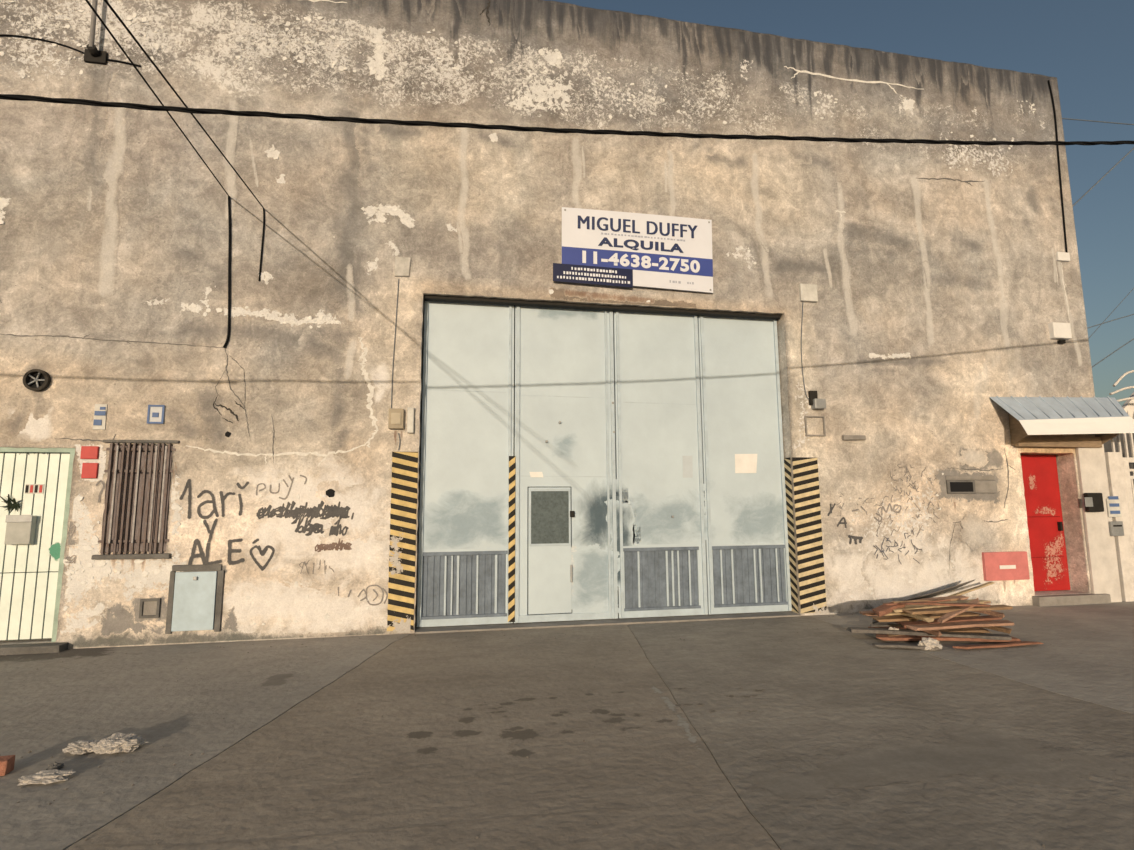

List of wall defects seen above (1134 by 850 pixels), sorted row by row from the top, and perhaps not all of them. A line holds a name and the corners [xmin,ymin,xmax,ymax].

leakage [379,0,631,72]
leakage [688,139,1026,434]
crack [0,300,378,466]